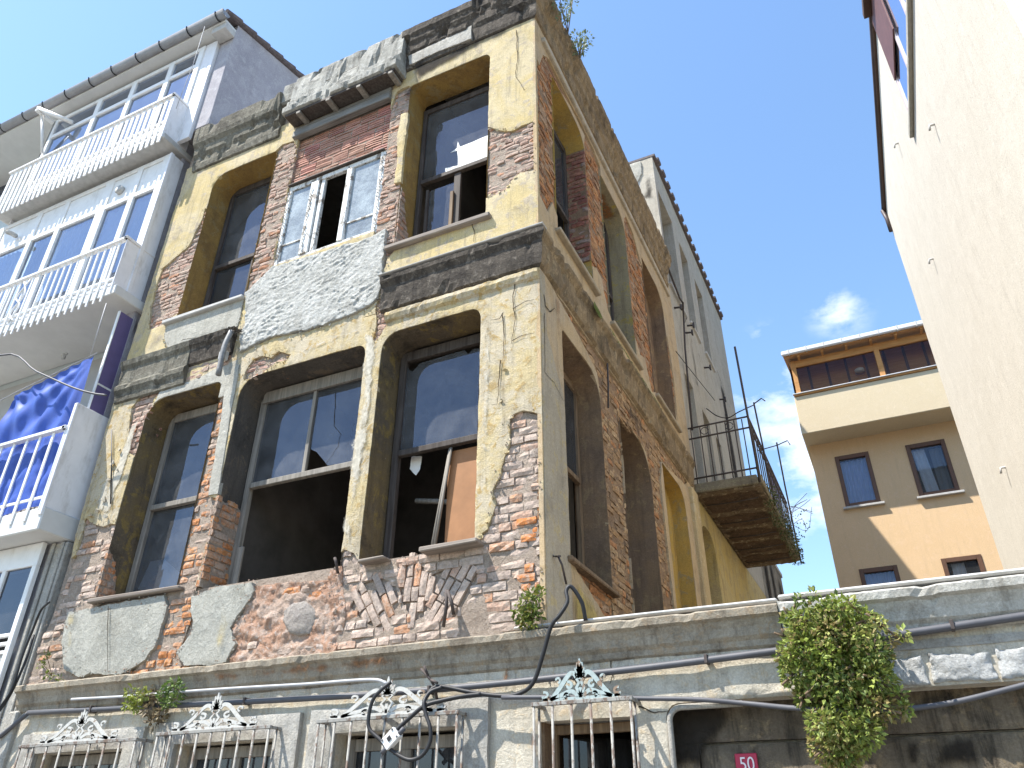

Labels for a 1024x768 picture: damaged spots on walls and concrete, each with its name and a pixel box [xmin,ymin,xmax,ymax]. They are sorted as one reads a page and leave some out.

spalling [26,393,162,685]
spalling [150,212,206,329]
spalling [130,398,240,674]
spalling [246,353,290,380]
peeling [351,300,387,496]
spalling [229,412,541,663]
spalling [372,88,411,268]
crack [493,284,555,405]
spalling [487,57,609,312]
spalling [564,308,685,617]